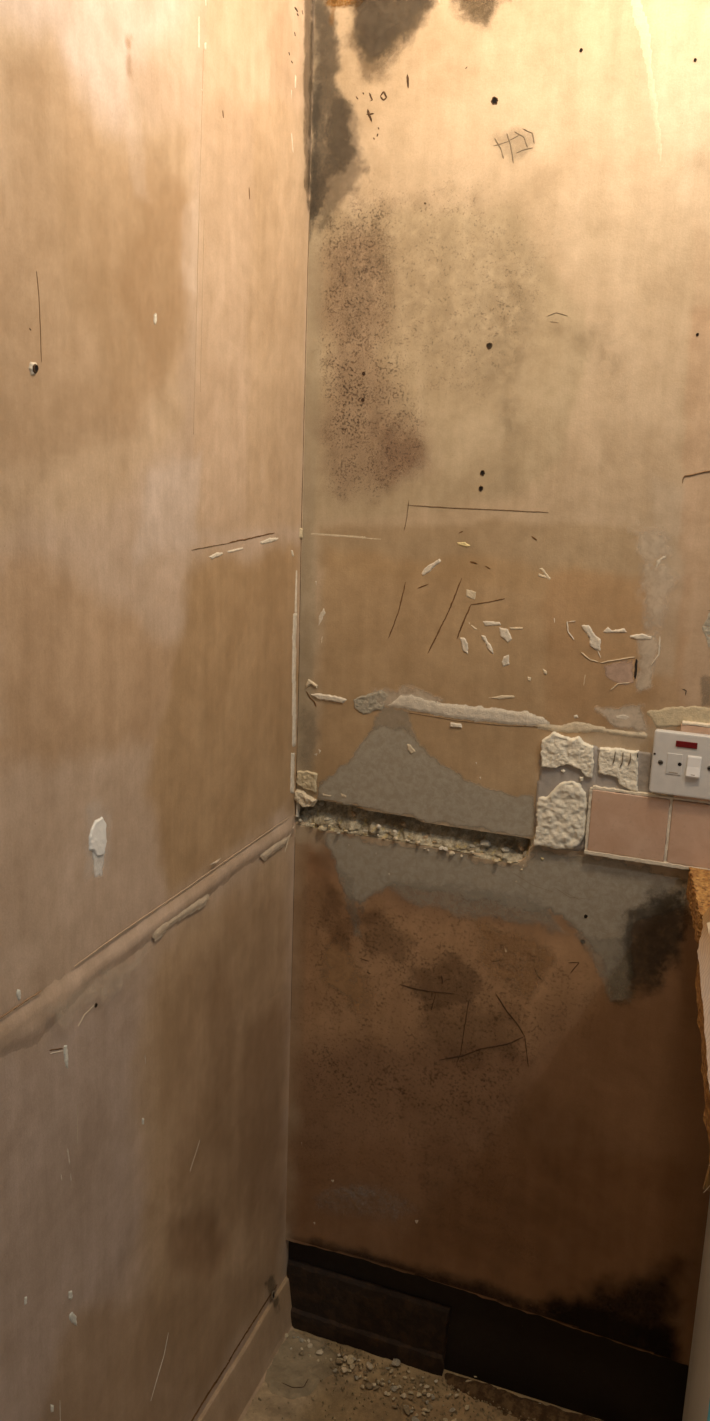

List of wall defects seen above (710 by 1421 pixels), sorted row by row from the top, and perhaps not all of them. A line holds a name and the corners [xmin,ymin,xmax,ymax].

damp [355,0,428,56]
damp [289,0,387,217]
peeling [419,559,441,588]
peeling [554,618,660,690]
spalling [290,570,533,870]
damp [609,896,682,1000]
damp [308,1242,675,1361]